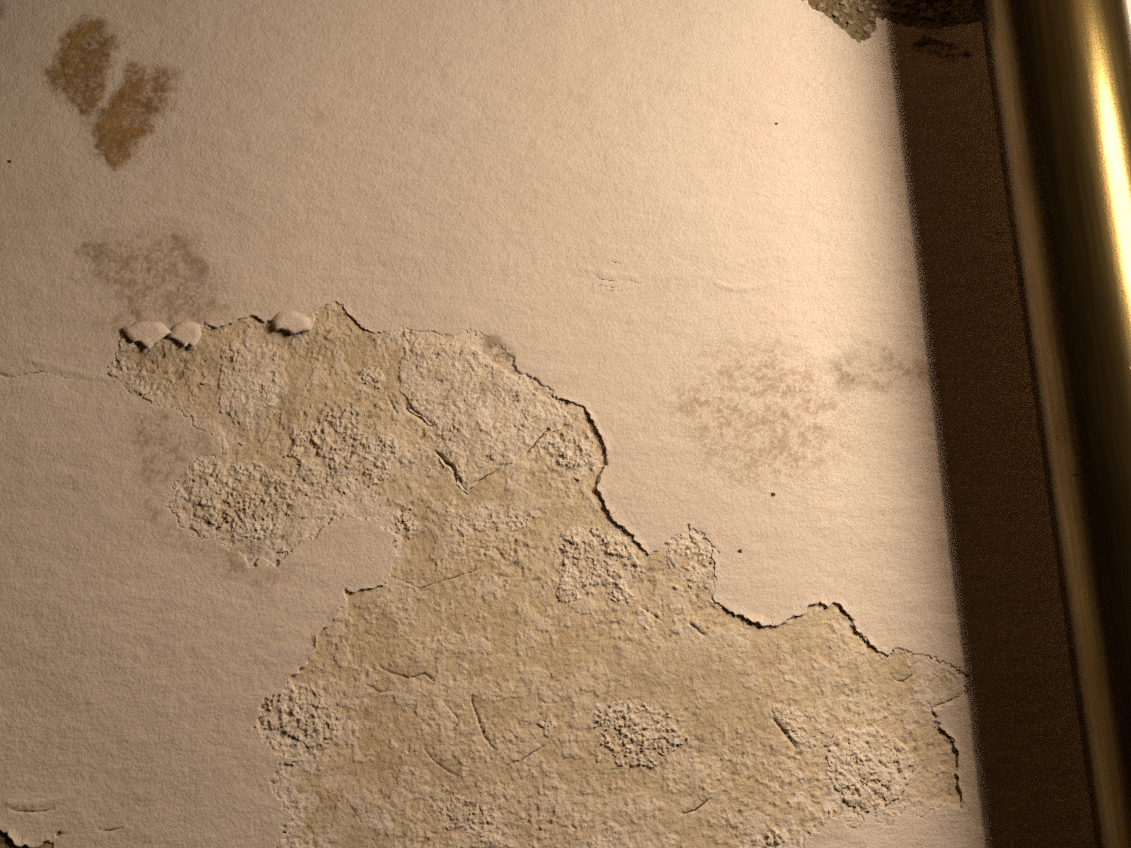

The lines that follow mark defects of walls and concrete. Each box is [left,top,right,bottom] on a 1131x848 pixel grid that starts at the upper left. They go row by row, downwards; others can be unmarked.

flaking render [801,0,981,43]
flaking render [108,297,969,848]
flaking render [0,821,61,848]